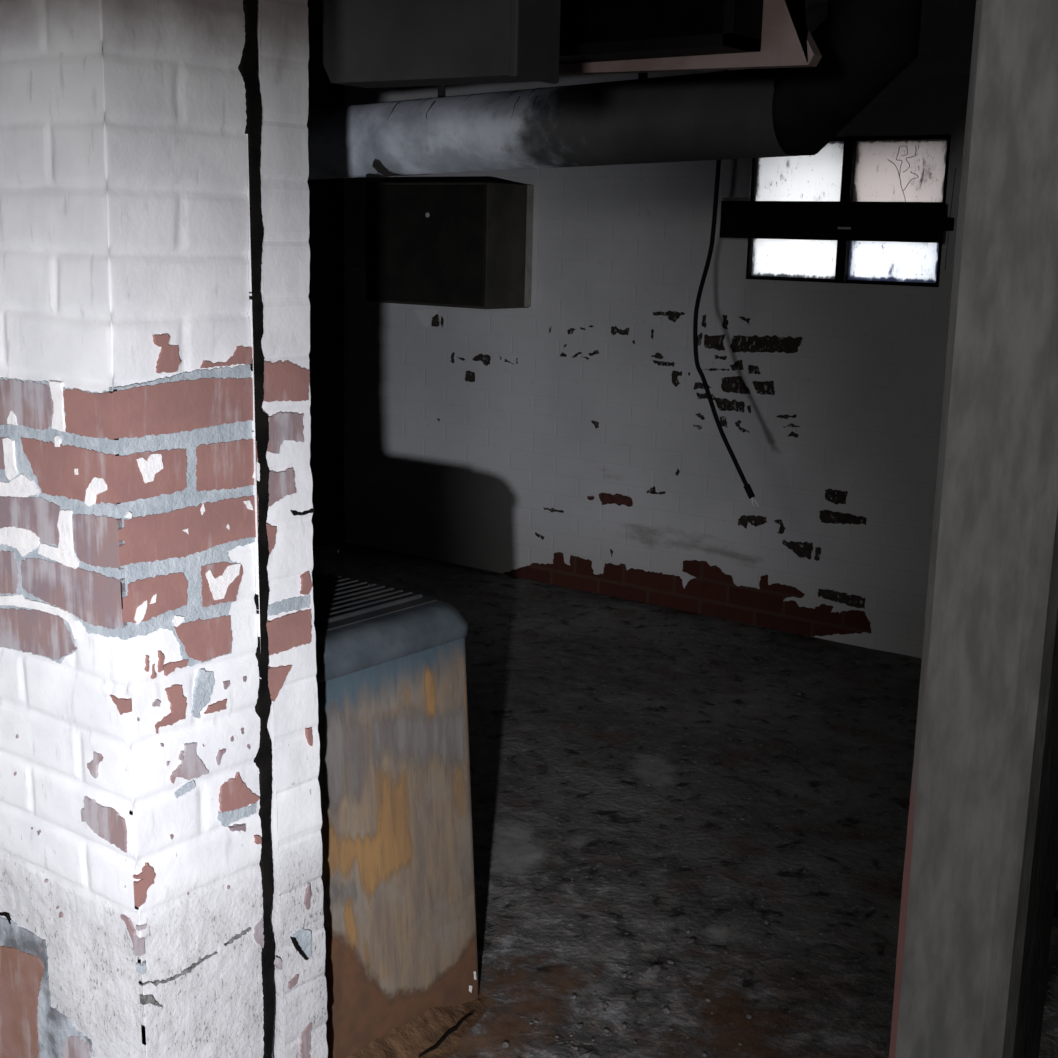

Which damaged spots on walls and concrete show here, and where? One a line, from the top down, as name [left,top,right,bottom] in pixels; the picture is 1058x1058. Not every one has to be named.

peeling [651,315,803,433]
peeling [0,334,313,747]
crack [139,0,315,1058]
peeling [587,493,633,507]
peeling [738,515,821,561]
peeling [819,489,867,525]
peeling [503,549,872,637]
peeling [166,728,250,798]
peeling [81,796,133,853]
peeling [217,773,262,844]
peeling [120,863,156,974]
flaking render [0,916,93,1058]